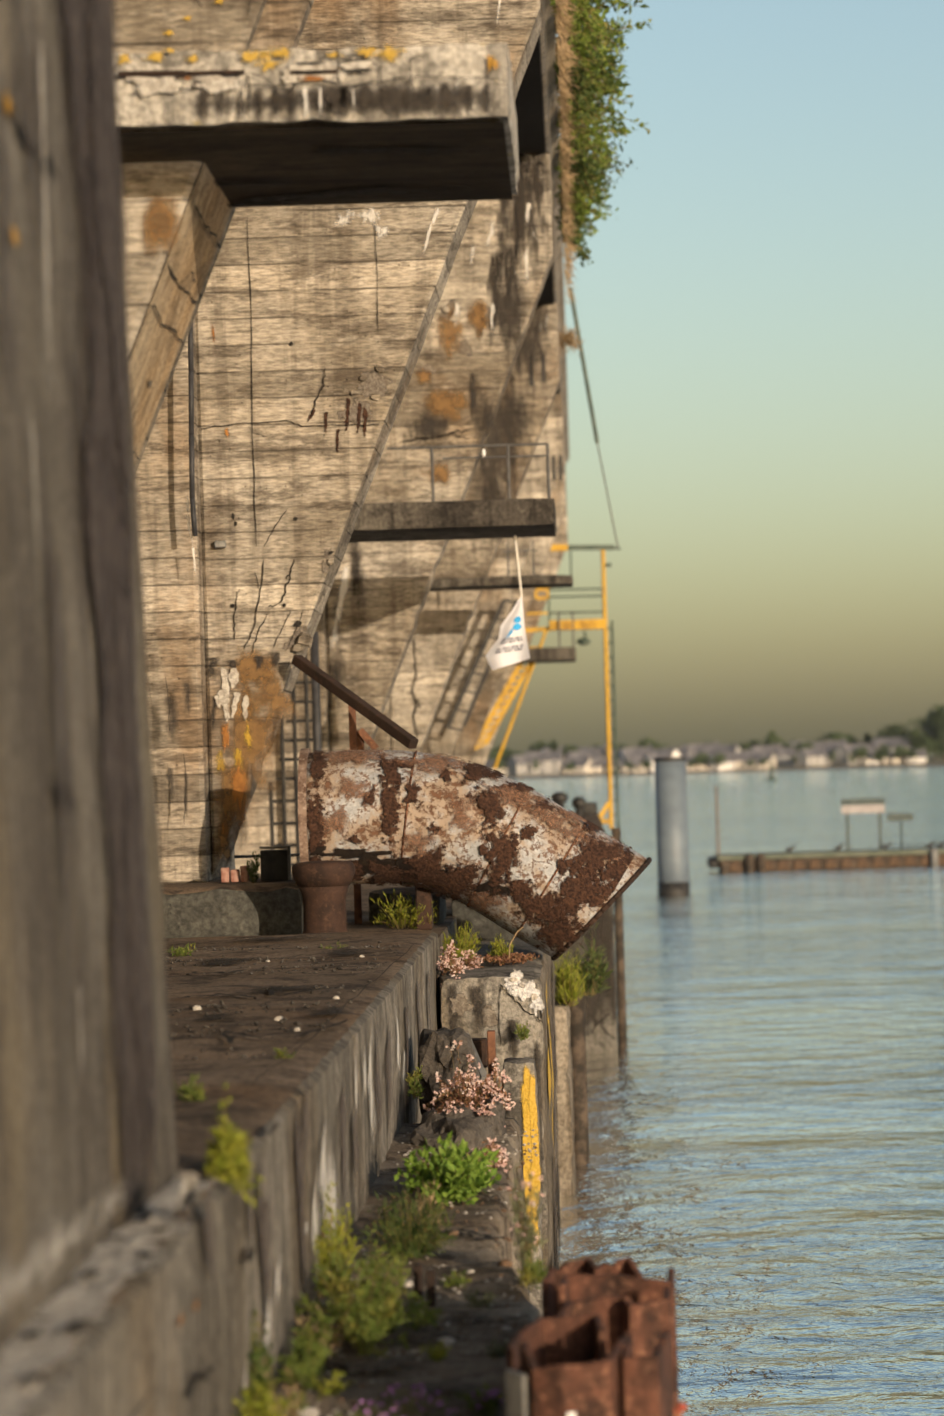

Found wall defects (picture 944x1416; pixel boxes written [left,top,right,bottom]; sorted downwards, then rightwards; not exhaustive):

damp [197,80,490,120]
crack [153,263,197,344]
corrosion [439,302,488,357]
damp [469,153,550,500]
corrosion [416,370,466,420]
crack [194,202,471,653]
damp [409,415,447,442]
corrosion [429,464,449,484]
corrosion [216,652,293,863]